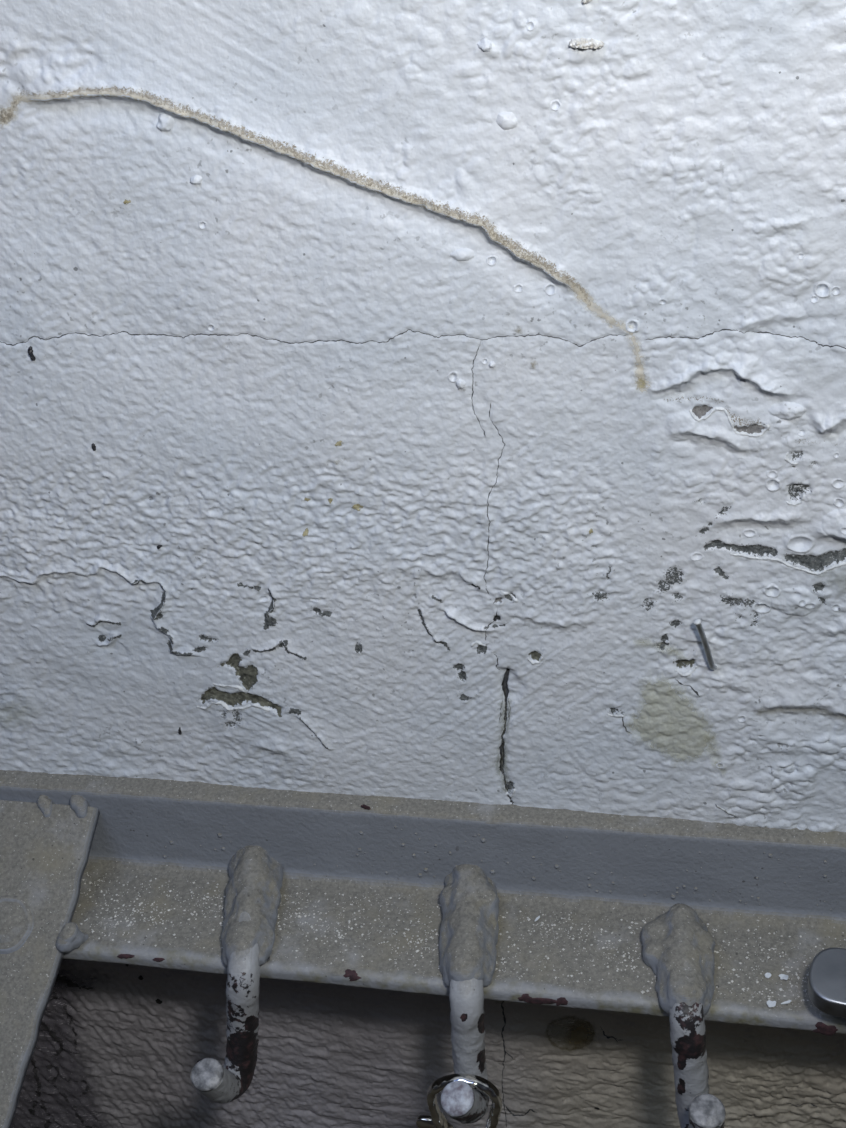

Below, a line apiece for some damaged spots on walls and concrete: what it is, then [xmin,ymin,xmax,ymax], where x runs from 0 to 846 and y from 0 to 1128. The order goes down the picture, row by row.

spalling [689,405,770,437]
spalling [784,451,815,506]
crack [1,329,846,804]
spalling [643,567,683,611]
spalling [720,593,759,626]
spalling [695,506,846,605]
peeling [0,559,335,751]
spalling [657,620,698,677]